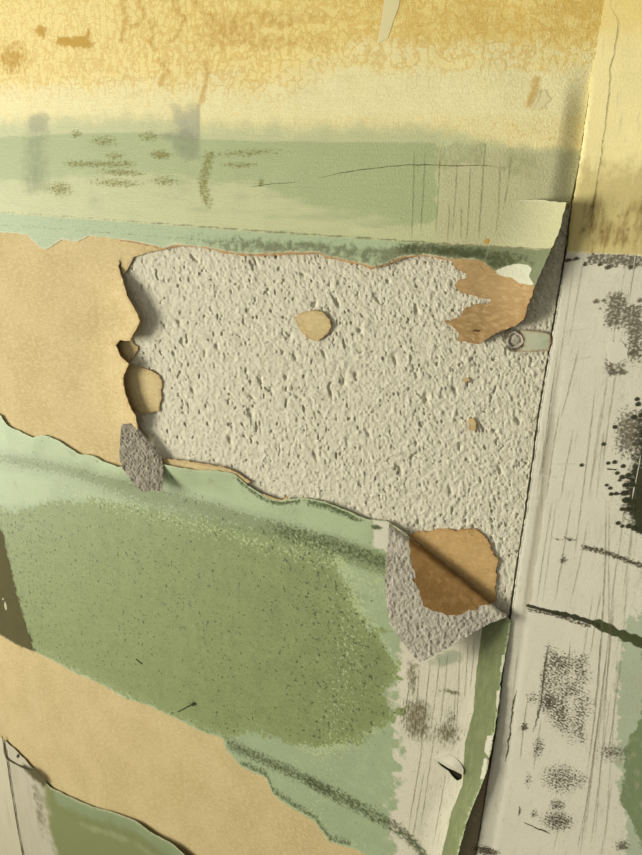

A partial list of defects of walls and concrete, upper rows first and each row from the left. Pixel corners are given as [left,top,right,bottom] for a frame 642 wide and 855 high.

leakage [56,28,93,48]
crack [510,1,618,619]
leakage [565,253,642,270]
leakage [593,292,642,375]
leakage [601,397,642,534]
peeling [0,202,571,855]
leakage [505,645,593,762]
crack [475,729,496,855]
leakage [518,765,584,833]